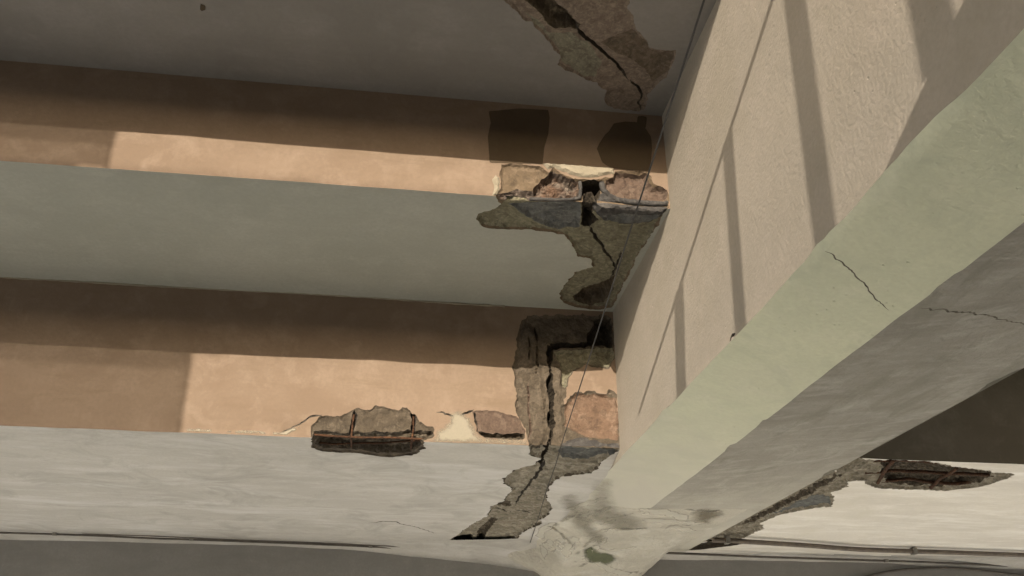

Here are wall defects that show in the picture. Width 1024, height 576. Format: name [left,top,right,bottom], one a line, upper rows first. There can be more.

flaking render [504,0,676,112]
spalling [451,163,670,540]
crack [825,251,888,310]
crack [922,308,1024,325]
spalling [311,405,434,457]
spalling [690,458,1014,550]